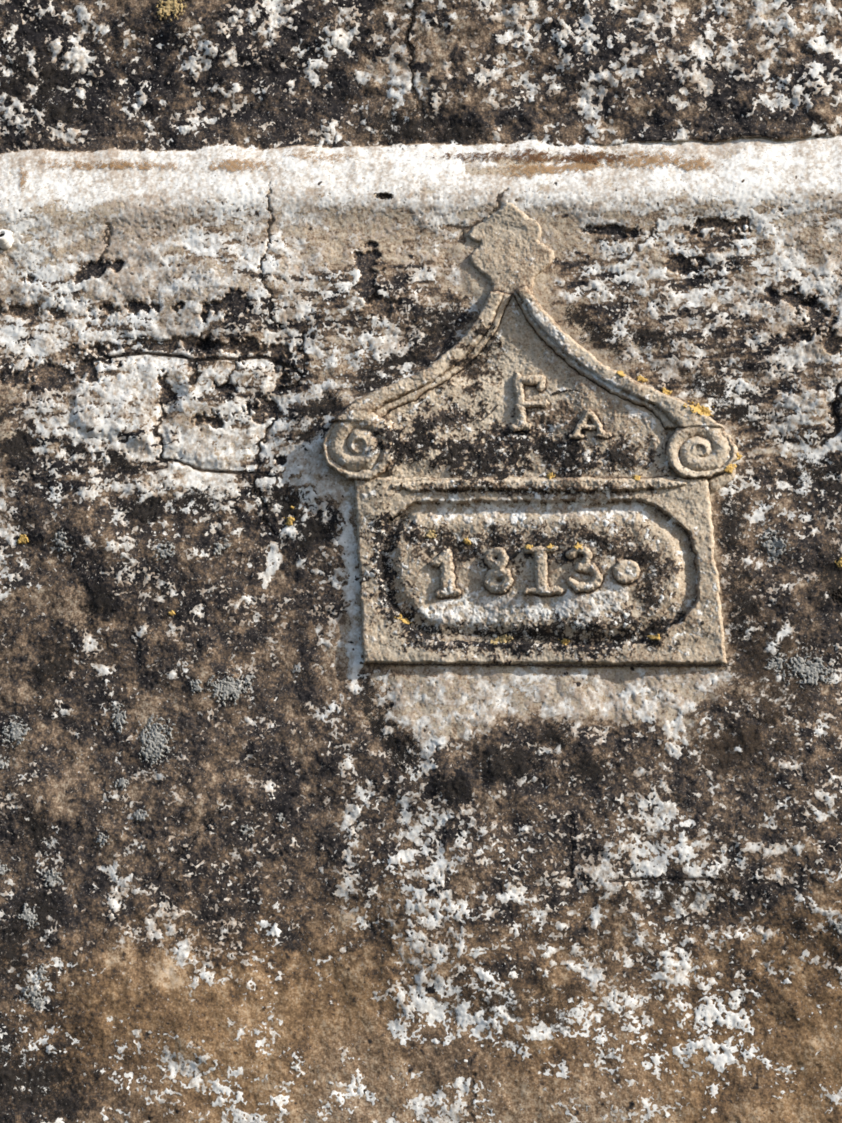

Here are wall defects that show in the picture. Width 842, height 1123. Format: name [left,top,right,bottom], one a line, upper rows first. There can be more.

crack [405,0,422,110]
crack [99,226,109,262]
crack [260,188,277,324]
crack [91,334,307,390]
crack [821,383,842,446]
leakage [65,438,231,526]
crack [153,403,273,533]
leakage [256,484,332,555]
leakage [359,672,422,772]
leakage [469,720,631,785]
leakage [618,866,733,909]
leakage [0,889,65,977]